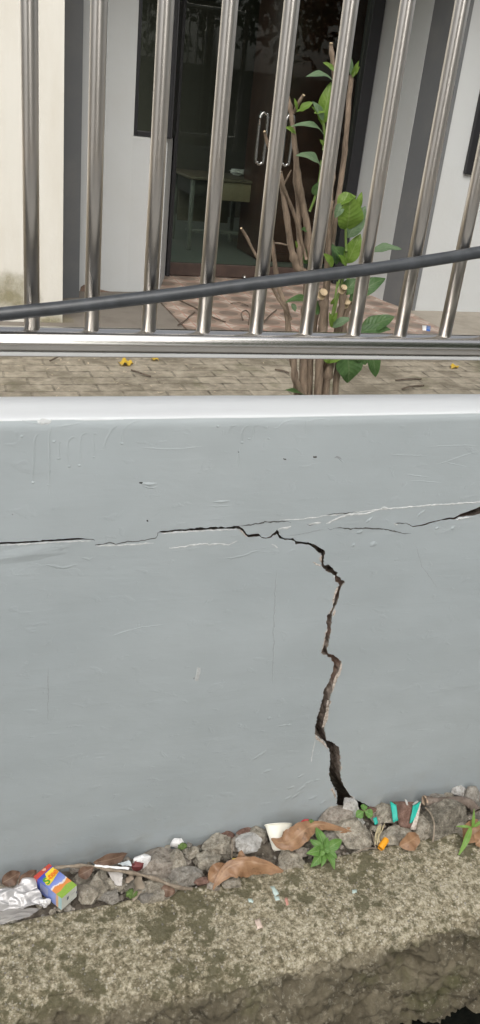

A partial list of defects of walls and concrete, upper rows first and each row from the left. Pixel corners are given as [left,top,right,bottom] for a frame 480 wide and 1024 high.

crack [0,507,480,806]